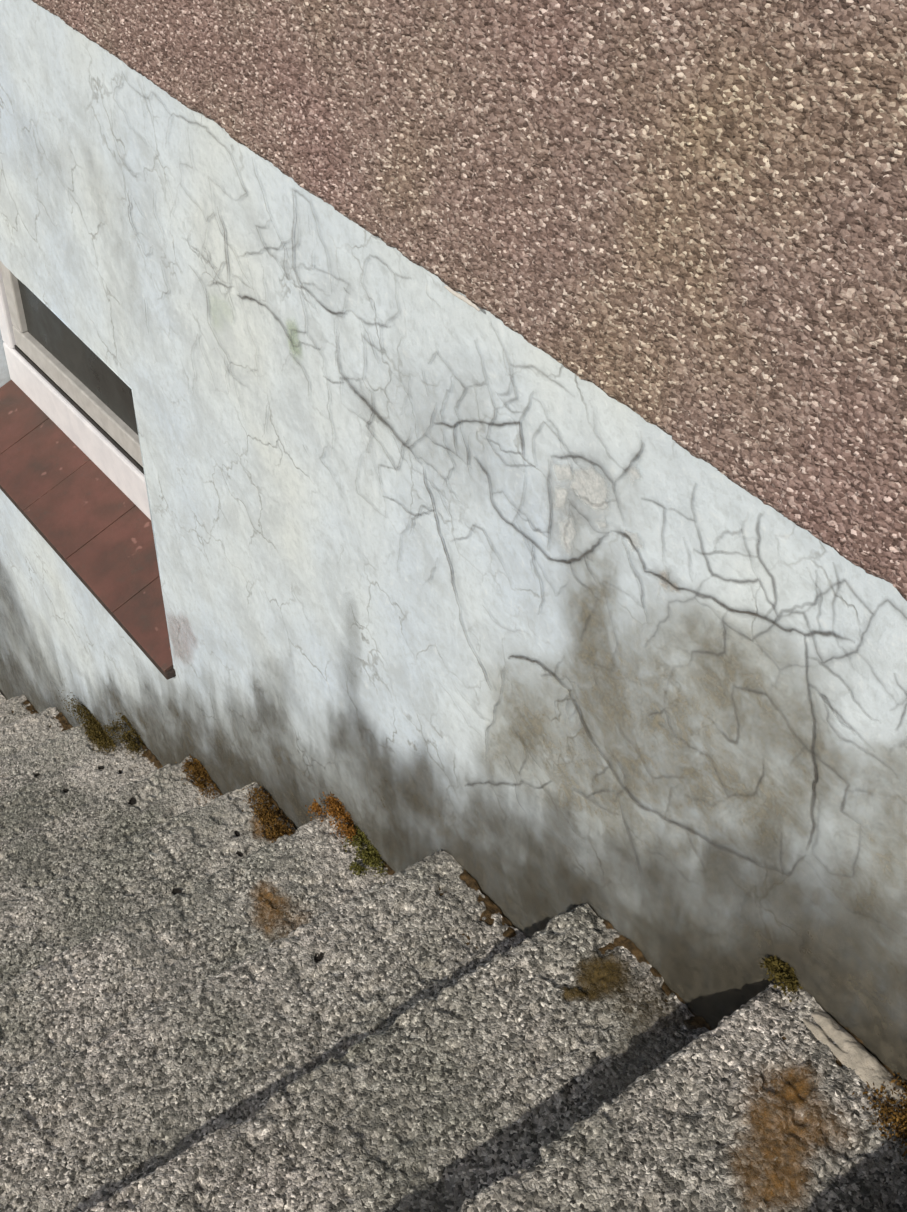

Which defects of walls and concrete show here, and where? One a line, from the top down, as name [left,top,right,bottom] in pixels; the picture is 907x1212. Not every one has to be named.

crack [220,219,289,338]
crack [348,383,412,452]
crack [410,479,456,595]
crack [440,413,839,863]
leakage [101,588,907,1085]